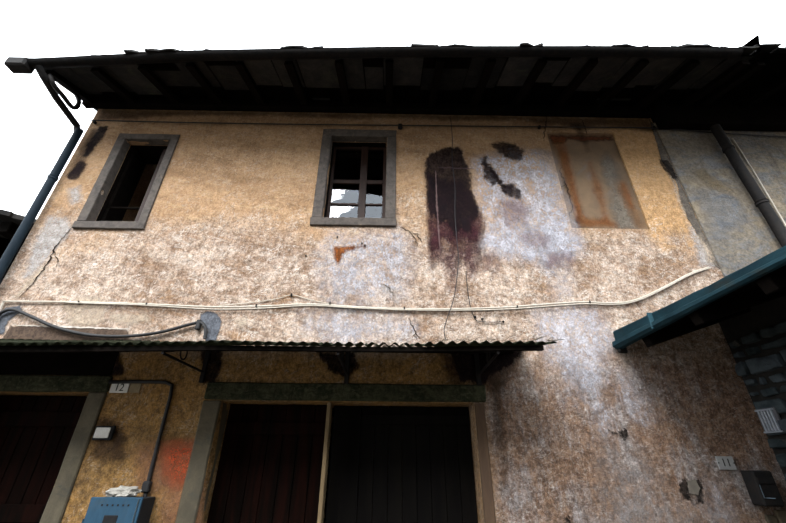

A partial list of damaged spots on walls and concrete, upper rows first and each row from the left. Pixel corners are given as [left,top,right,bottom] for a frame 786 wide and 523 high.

damp [67,110,268,180]
corrosion [549,135,613,156]
damp [424,147,577,266]
crack [21,228,71,295]
flaking render [679,478,704,504]